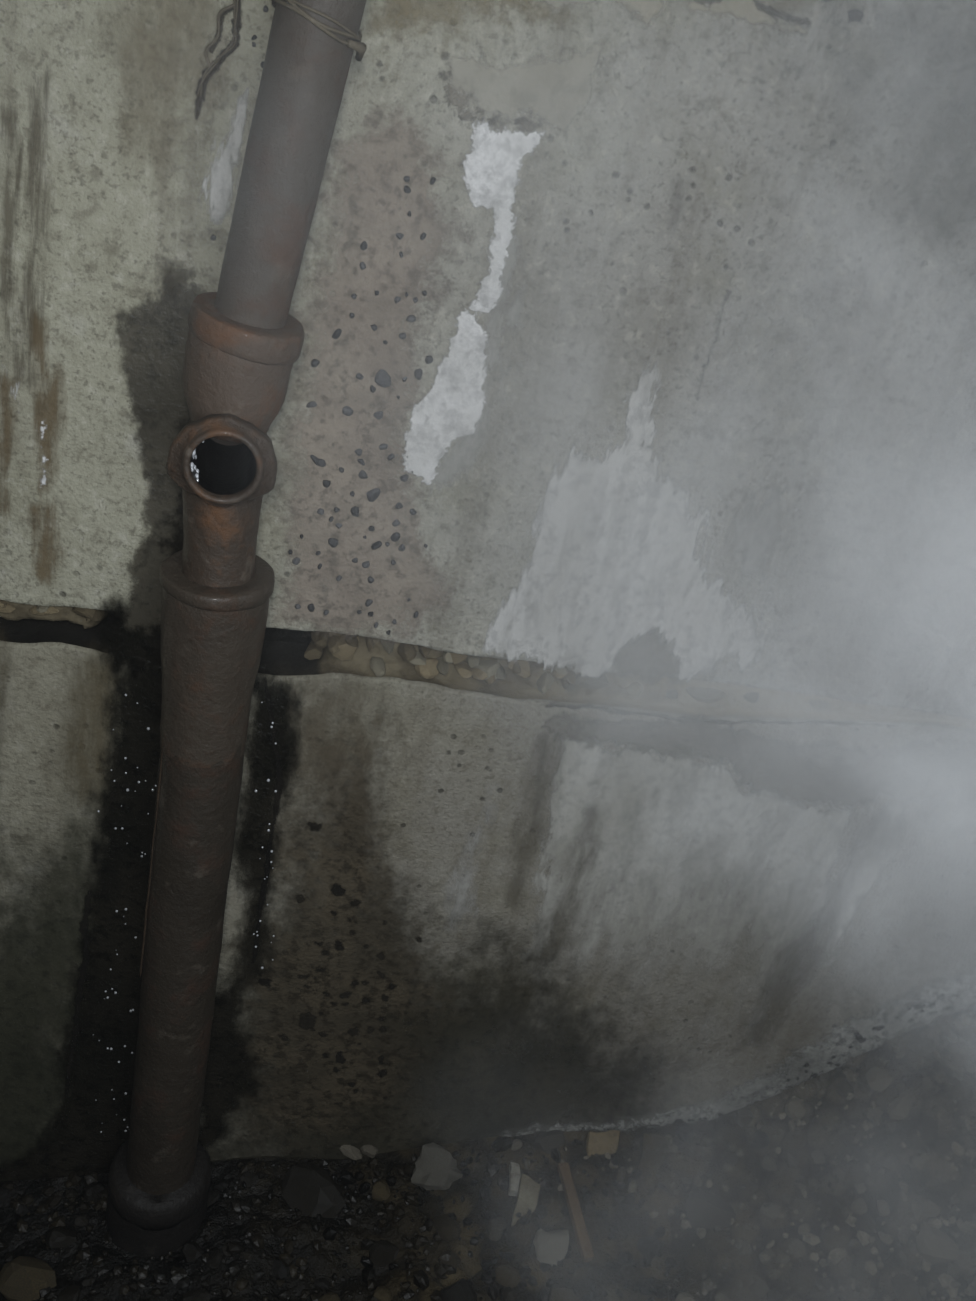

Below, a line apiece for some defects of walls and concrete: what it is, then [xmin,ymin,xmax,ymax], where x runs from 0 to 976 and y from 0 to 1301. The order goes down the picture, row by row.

crack [695,0,721,8]
crack [754,0,811,26]
corrosion [0,377,12,466]
leakage [2,78,47,336]
corrosion [32,507,56,581]
corrosion [32,315,59,466]
peeling [402,72,544,485]
peeling [483,364,768,681]
leakage [0,268,198,1181]
leakage [198,673,976,1162]